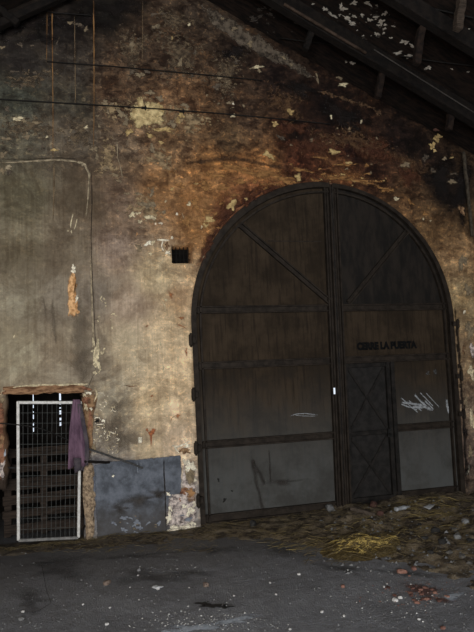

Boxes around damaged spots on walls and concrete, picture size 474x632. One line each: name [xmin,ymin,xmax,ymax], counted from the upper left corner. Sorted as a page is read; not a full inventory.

peeling [322,0,396,40]
peeling [114,5,382,117]
peeling [1,90,218,190]
peeling [194,81,454,201]
peeling [113,183,169,235]
damp [425,157,473,225]
spalling [135,236,173,256]
spalling [68,264,80,316]
spalling [111,439,197,533]